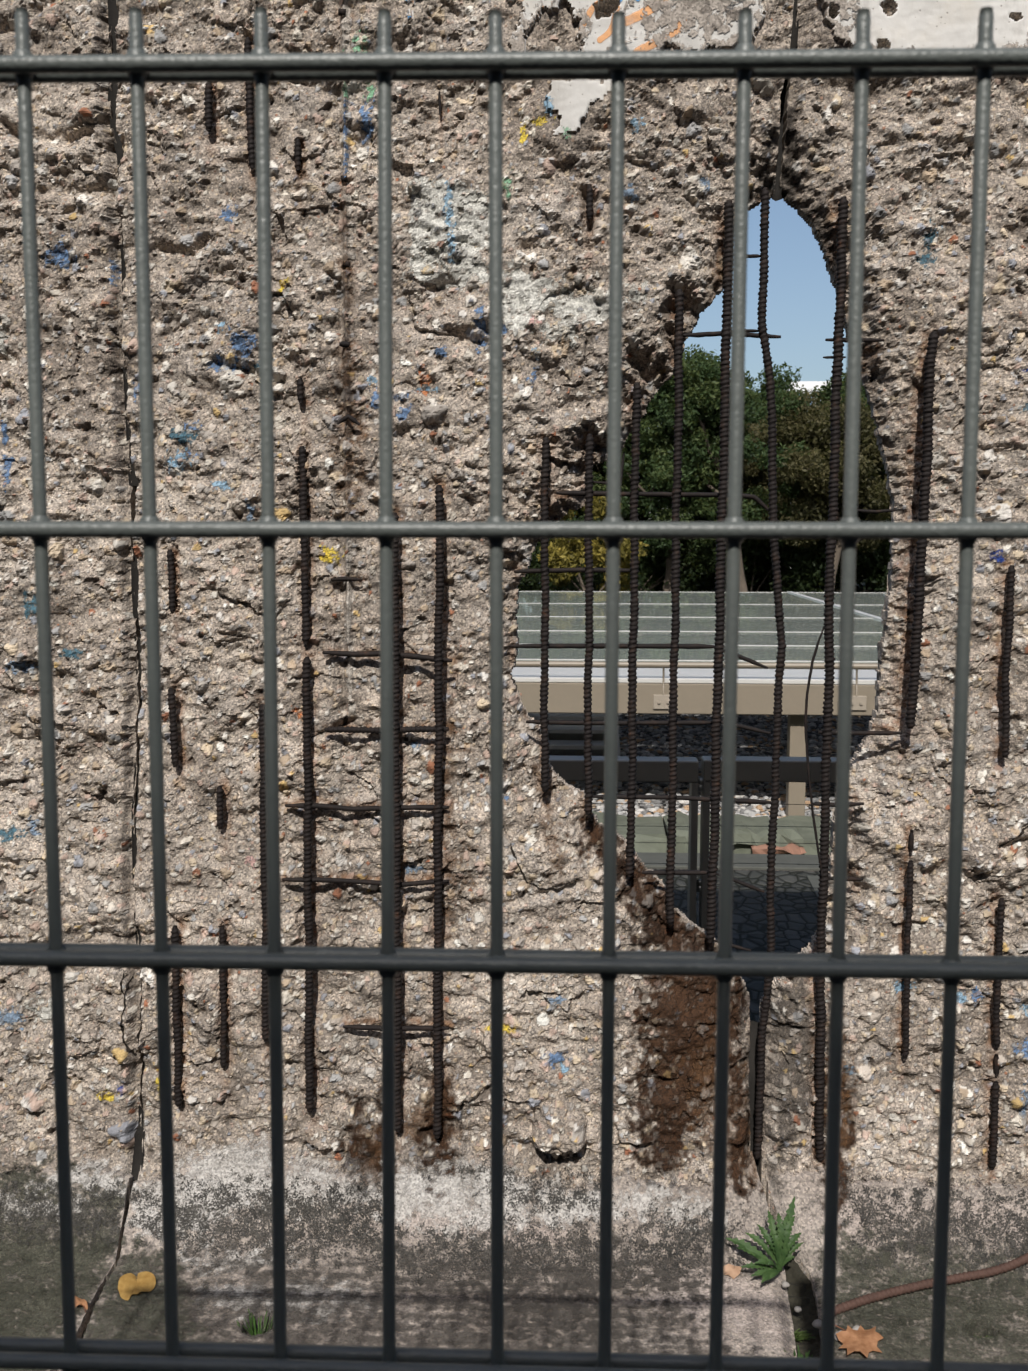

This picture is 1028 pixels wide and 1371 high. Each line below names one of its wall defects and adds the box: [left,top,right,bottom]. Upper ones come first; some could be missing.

crack [107,0,124,165]
spalling [0,0,891,55]
spalling [880,0,898,16]
spalling [0,77,1028,956]
crack [131,553,142,888]
corrosion [549,802,718,952]
crack [119,929,145,1258]
damp [0,1124,788,1356]
corrosion [402,1072,461,1197]
spalling [0,966,1028,1191]
corrosion [616,975,764,1211]
damp [738,977,826,1183]